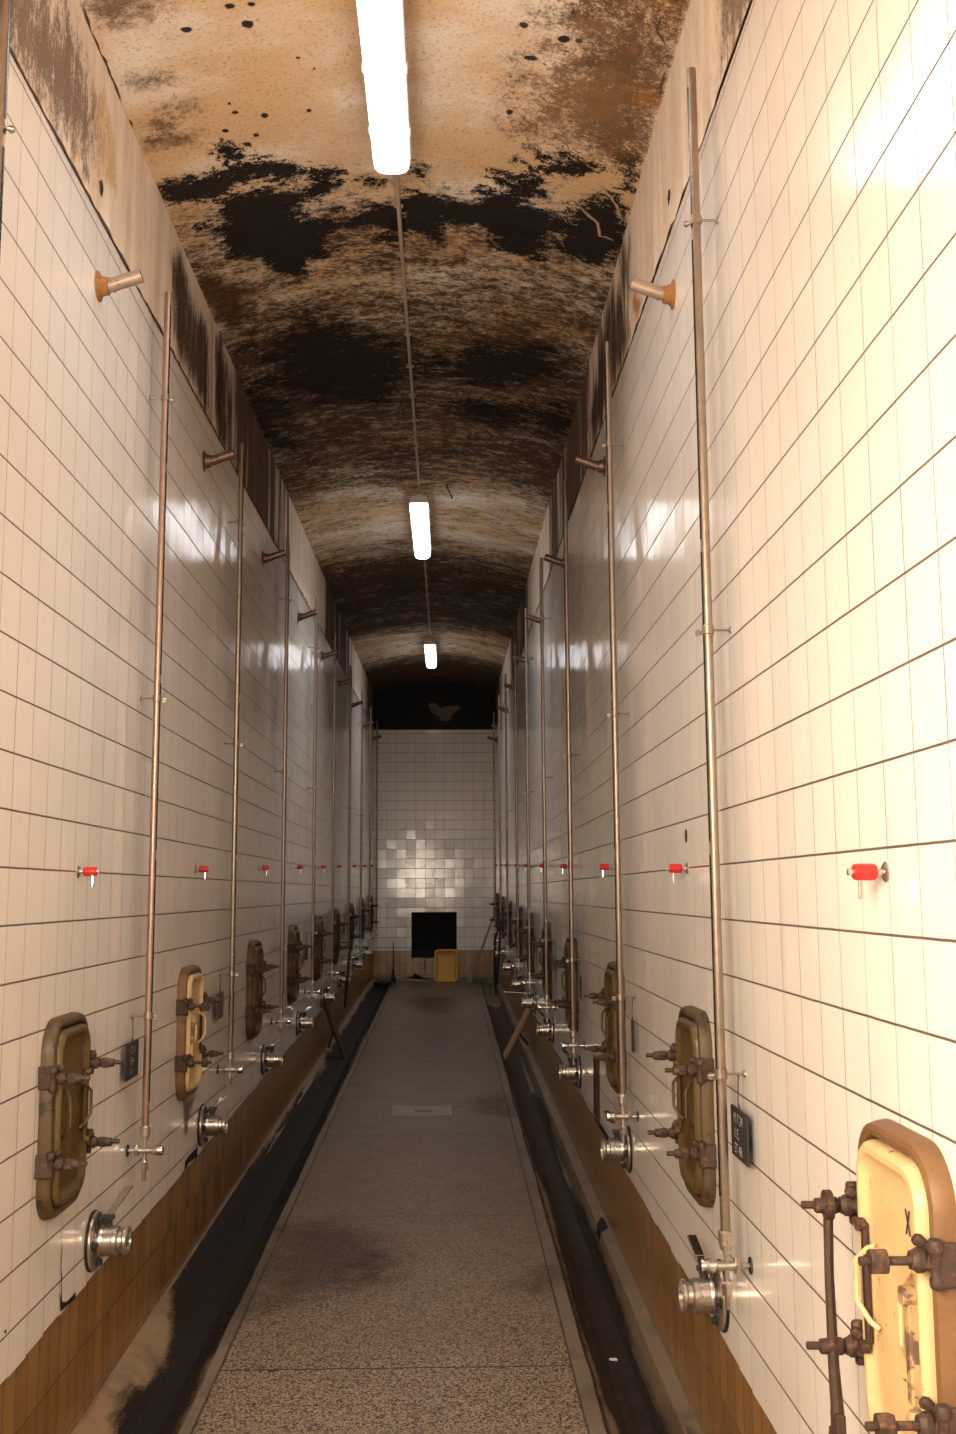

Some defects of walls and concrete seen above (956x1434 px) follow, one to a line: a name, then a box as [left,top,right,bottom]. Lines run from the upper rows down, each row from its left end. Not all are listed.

damp [10,0,160,183]
damp [716,0,749,75]
damp [144,0,689,454]